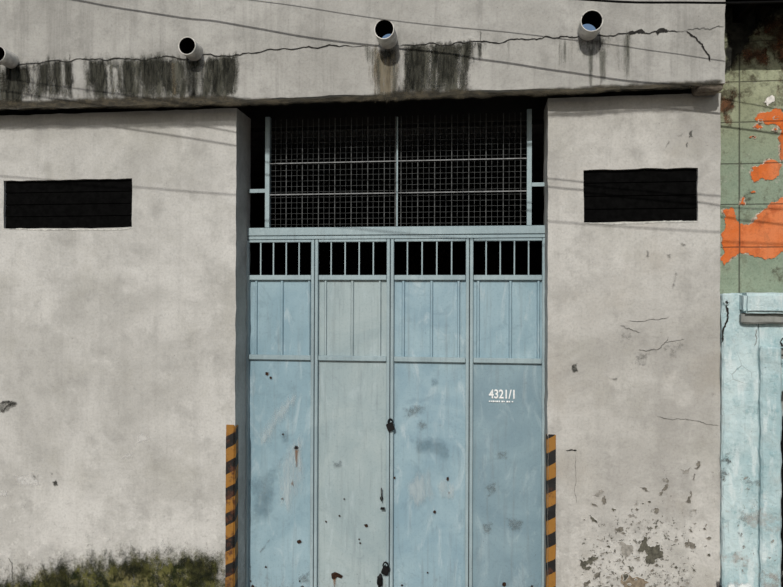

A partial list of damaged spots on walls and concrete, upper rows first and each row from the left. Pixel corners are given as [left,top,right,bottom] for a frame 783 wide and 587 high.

leakage [0,58,73,109]
leakage [85,53,238,98]
crack [17,44,364,66]
leakage [367,40,481,94]
crack [401,25,723,61]
leakage [725,0,758,74]
peeling [720,95,783,266]
crack [624,318,683,352]
peeling [579,477,712,587]